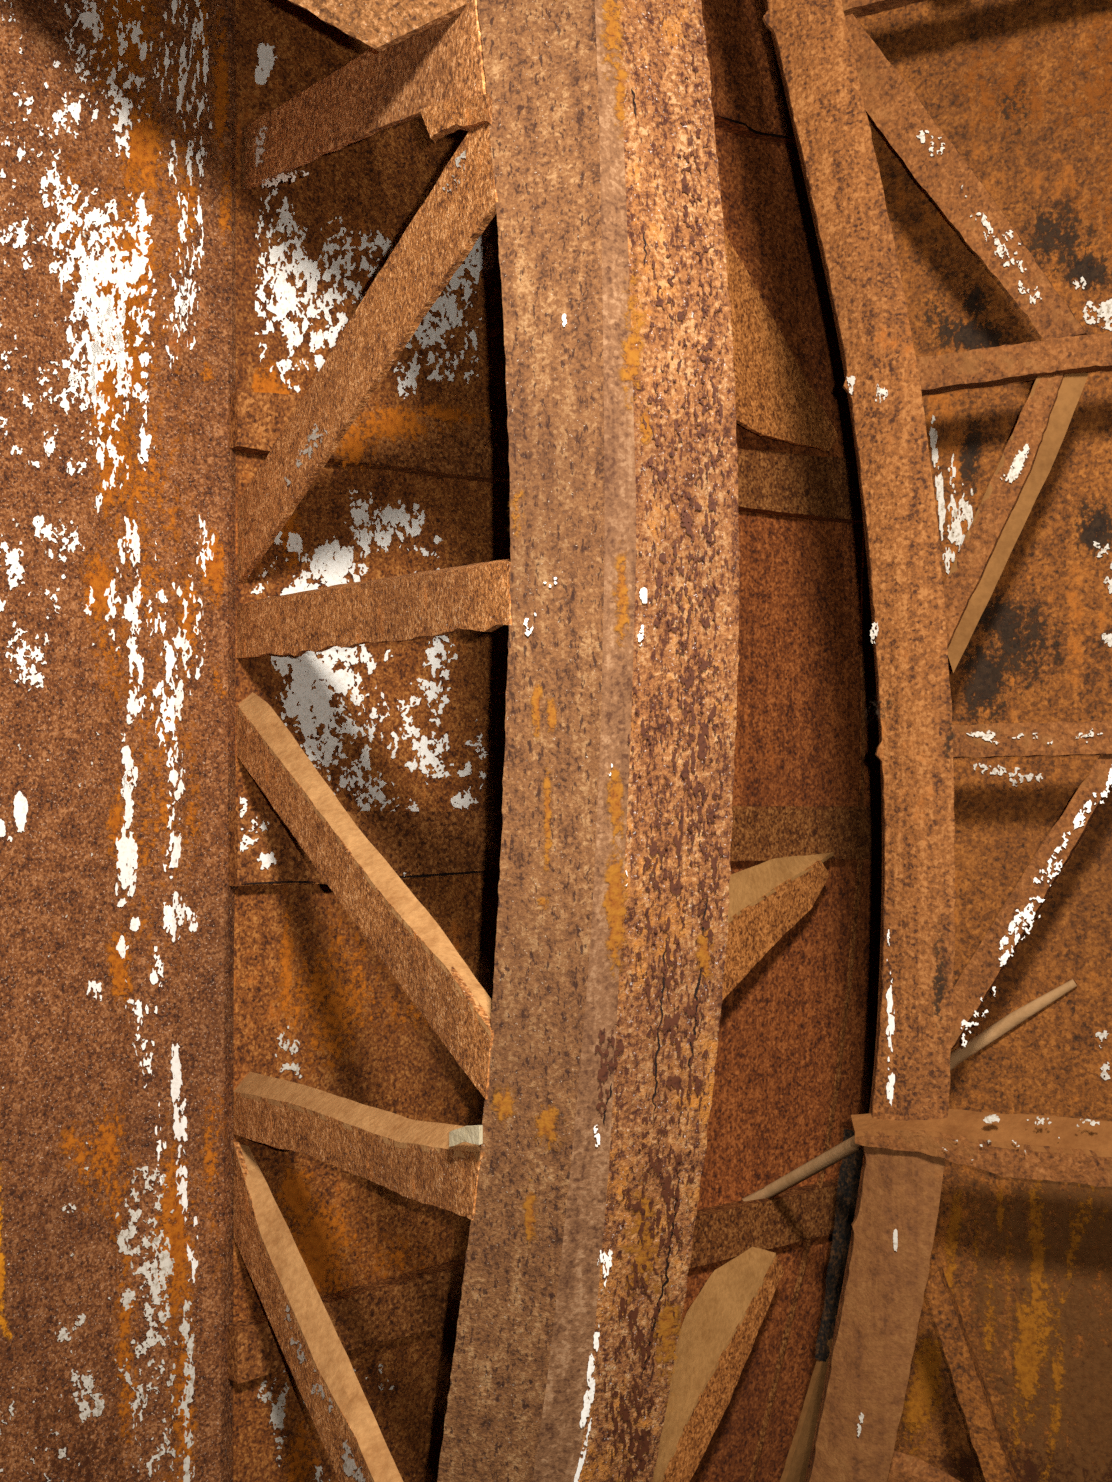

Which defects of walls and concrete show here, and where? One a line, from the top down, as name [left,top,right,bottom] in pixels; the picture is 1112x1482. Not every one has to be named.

peeling [0,0,212,513]
peeling [255,126,393,393]
peeling [0,501,85,691]
rust [57,0,232,1003]
peeling [84,501,215,987]
peeling [271,635,488,811]
rust [602,119,730,1482]
rust [0,1168,13,1339]
rust [59,1099,136,1230]
peeling [108,979,198,1482]
rust [153,1095,223,1482]
rust [944,1180,1108,1479]